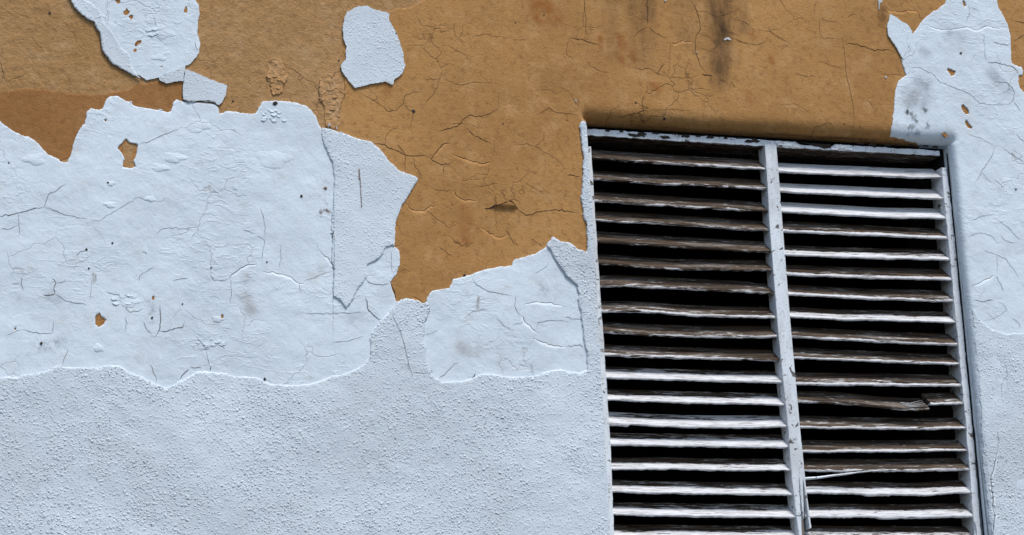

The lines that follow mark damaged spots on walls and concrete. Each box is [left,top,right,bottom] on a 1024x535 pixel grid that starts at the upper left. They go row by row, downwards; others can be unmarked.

crack [633,1,785,86]
crack [2,185,164,234]
crack [360,78,578,255]
peeling [0,0,946,303]
crack [480,182,579,272]
crack [13,267,226,380]
crack [211,211,476,378]
crack [469,278,583,349]
crack [946,153,1021,535]